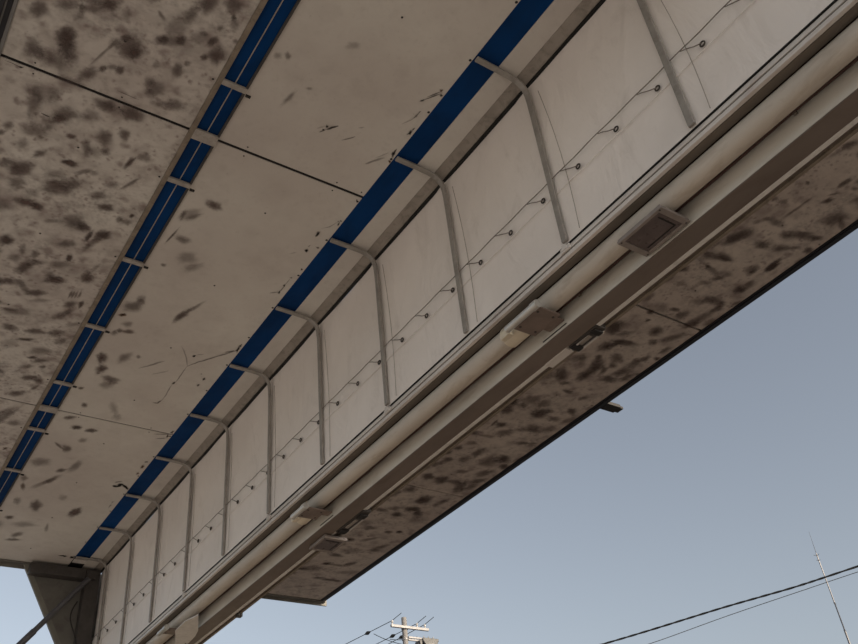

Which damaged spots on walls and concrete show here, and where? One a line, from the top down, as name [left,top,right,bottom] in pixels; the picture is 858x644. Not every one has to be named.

leakage [59,27,74,53]
leakage [201,38,224,61]
leakage [98,101,141,120]
leakage [17,198,42,210]
leakage [98,354,114,382]
leakage [579,341,639,382]
leakage [424,451,509,491]